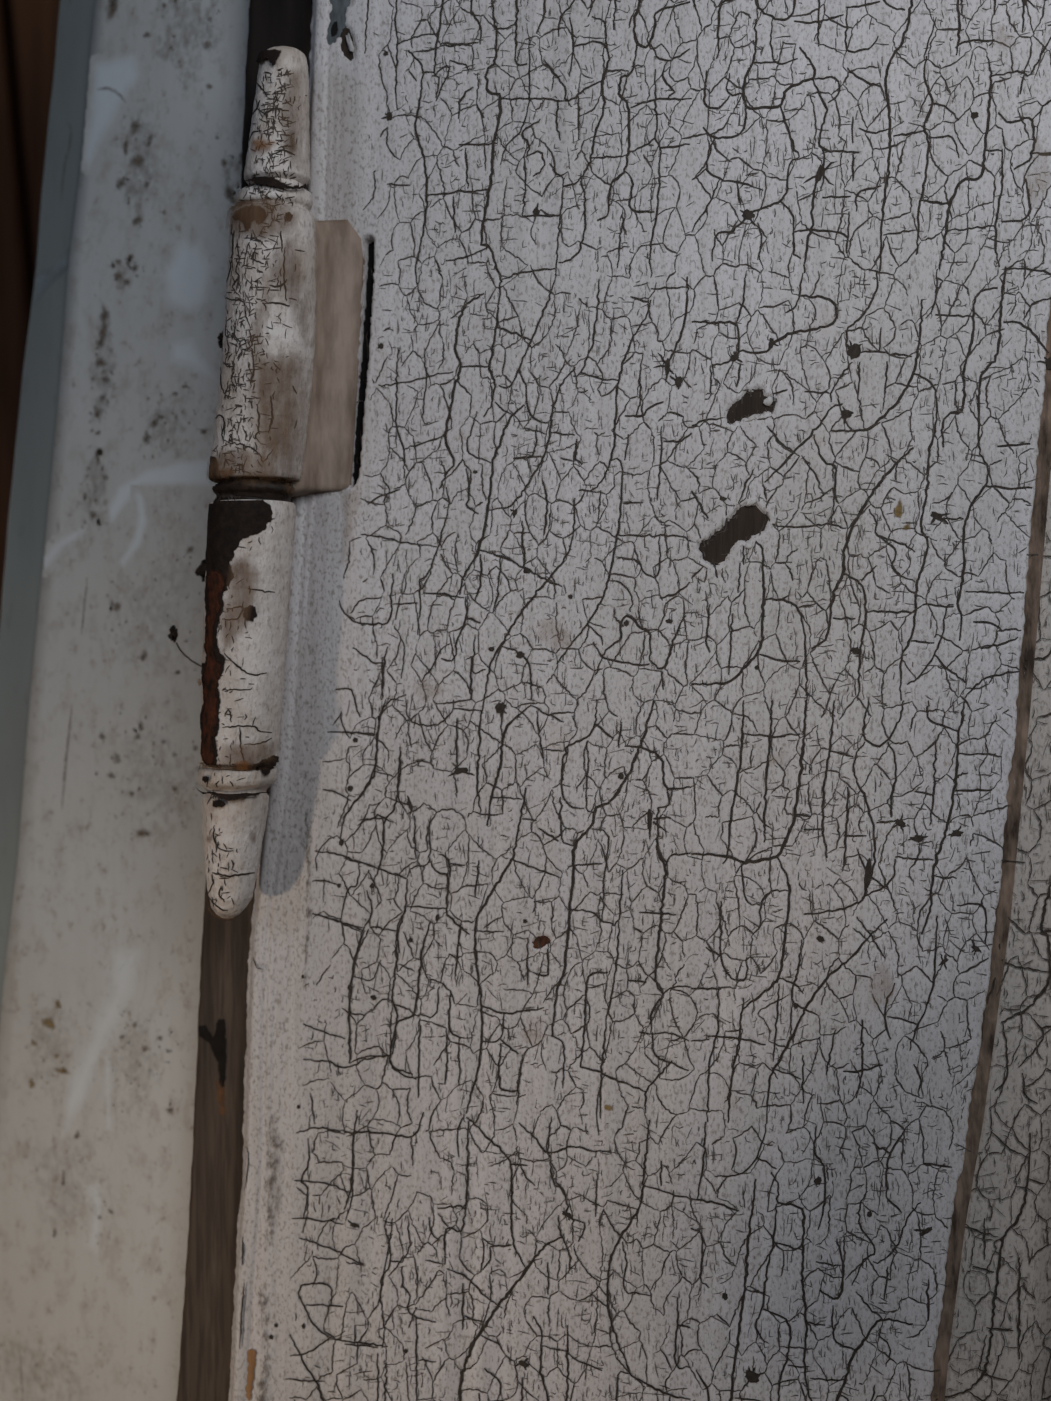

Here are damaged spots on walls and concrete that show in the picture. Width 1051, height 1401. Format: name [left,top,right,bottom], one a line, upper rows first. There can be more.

peeling [326,0,354,61]
peeling [726,388,776,424]
crack [206,68,307,911]
peeling [699,497,768,566]
rust [198,497,279,783]
peeling [245,1349,256,1400]